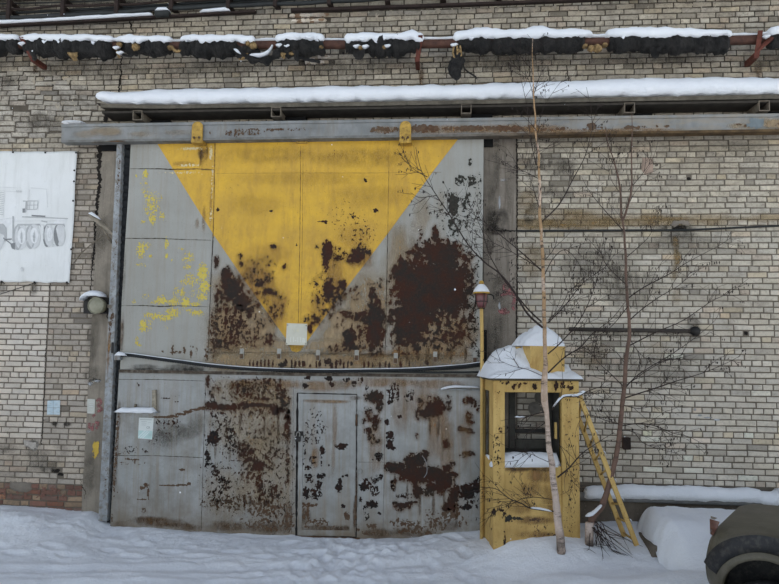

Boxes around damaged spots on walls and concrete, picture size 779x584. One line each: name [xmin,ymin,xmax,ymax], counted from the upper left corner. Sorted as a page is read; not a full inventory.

peeling [135,169,165,225]
peeling [183,146,220,221]
peeling [133,244,289,362]
peeling [196,158,482,535]
rust [209,275,471,371]
rust [512,467,549,481]